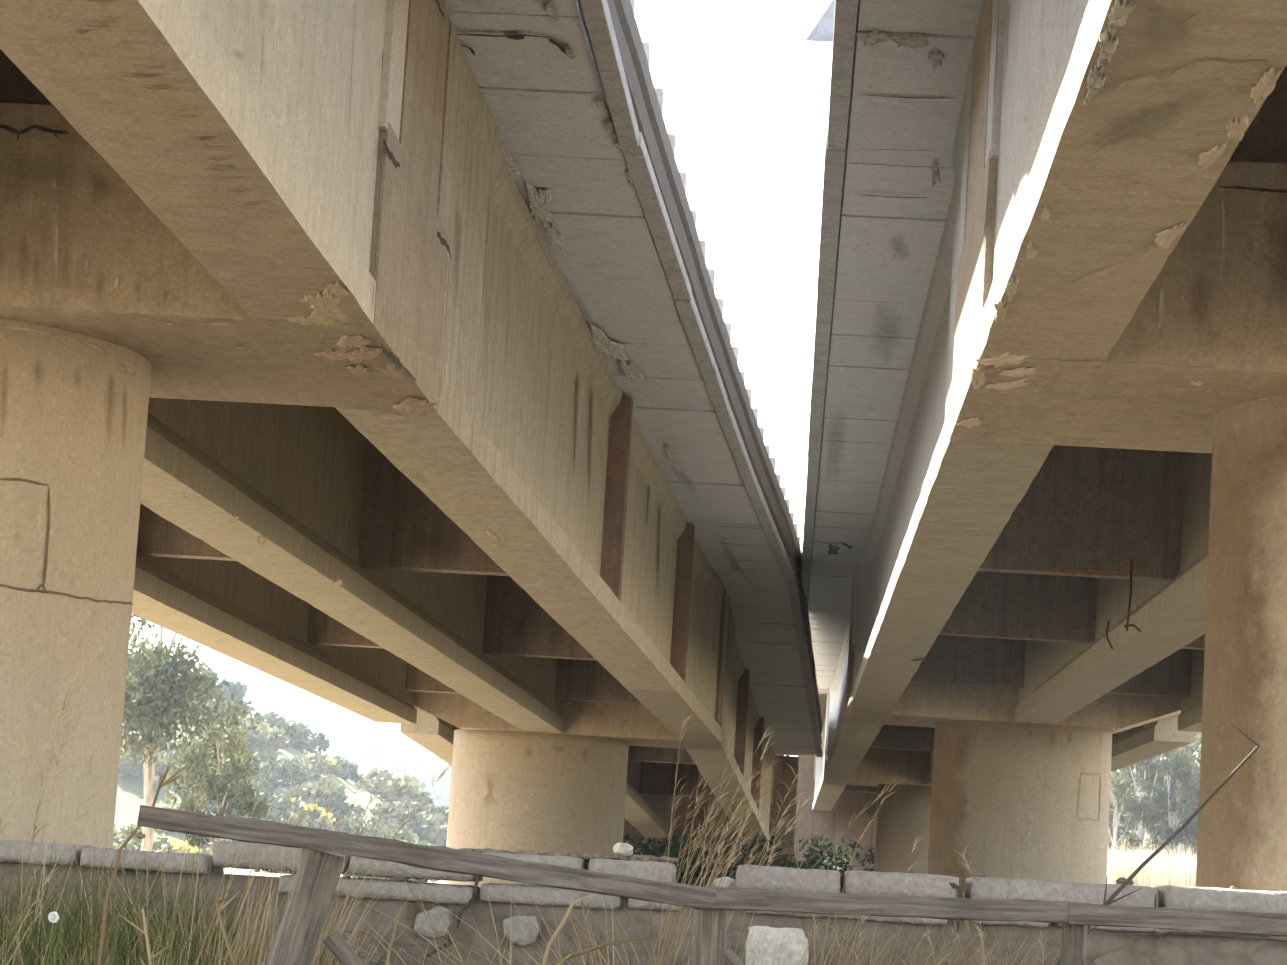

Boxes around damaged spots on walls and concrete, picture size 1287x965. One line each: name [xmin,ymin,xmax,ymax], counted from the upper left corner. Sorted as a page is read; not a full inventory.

spalling [856,28,944,72]
spalling [1083,0,1137,105]
crack [0,124,70,142]
spalling [1198,67,1281,170]
crack [1217,185,1287,193]
spalling [1154,222,1186,249]
spalling [284,282,407,378]
spalling [970,352,1039,391]
crack [0,478,133,605]
spalling [1027,558,1141,649]